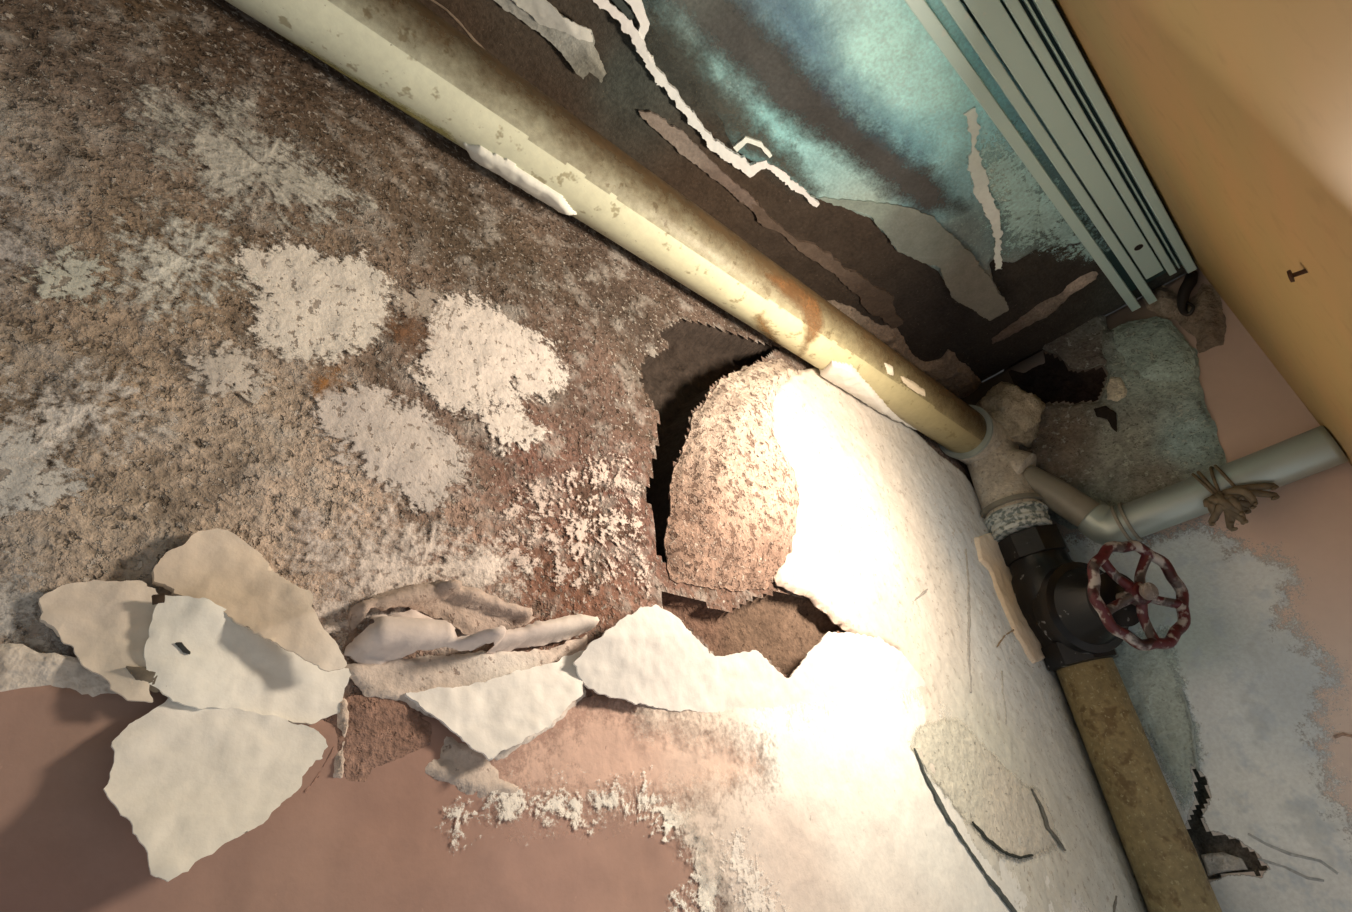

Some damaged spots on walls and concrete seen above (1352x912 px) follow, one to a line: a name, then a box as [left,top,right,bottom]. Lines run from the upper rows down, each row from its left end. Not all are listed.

peeling [463,142,577,215]
peeling [494,0,606,83]
peeling [593,0,1009,321]
leakage [642,0,1111,262]
leakage [0,77,654,654]
flaking render [1004,349,1107,404]
peeling [0,528,926,882]
crack [914,748,1066,912]
crack [1180,691,1339,882]